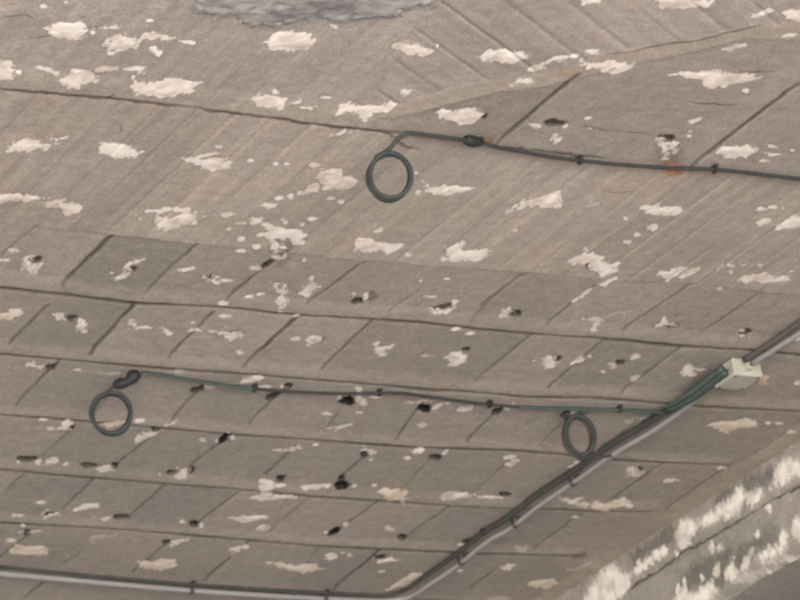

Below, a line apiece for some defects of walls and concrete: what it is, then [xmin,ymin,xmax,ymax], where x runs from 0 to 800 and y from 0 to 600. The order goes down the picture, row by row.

spalling [0,59,204,99]
spalling [667,69,762,93]
spalling [334,89,412,123]
spalling [336,387,383,414]
spalling [404,399,474,412]
spalling [705,417,798,434]
spalling [248,474,357,501]
leakage [715,469,773,505]
spalling [34,500,62,519]
spalling [5,513,50,556]
leakage [632,526,675,565]
leakage [680,530,775,588]